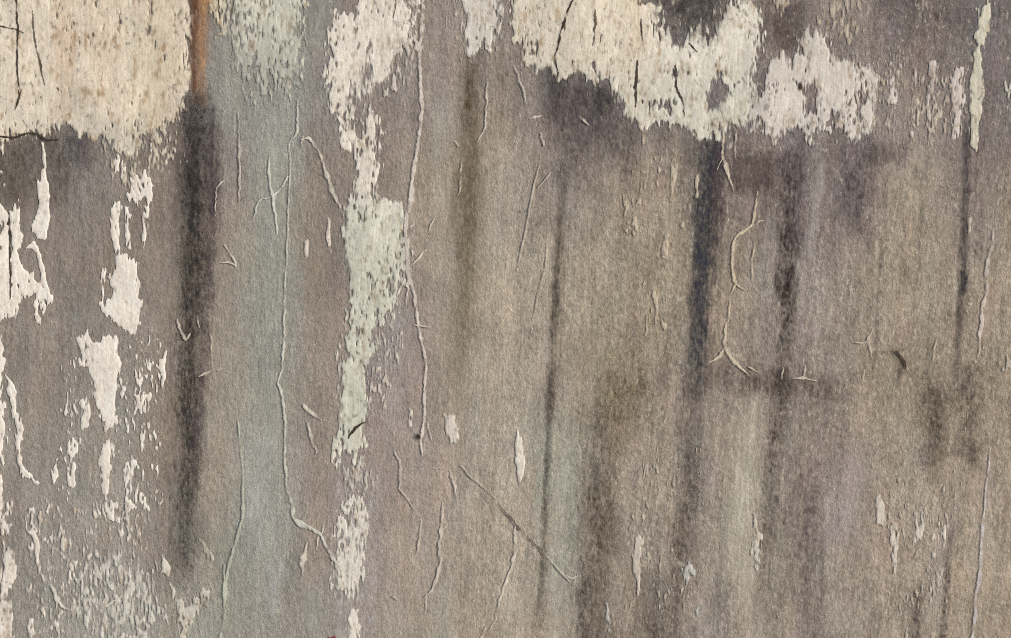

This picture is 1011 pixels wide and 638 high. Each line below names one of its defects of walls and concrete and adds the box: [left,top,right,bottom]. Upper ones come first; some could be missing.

crack [0,0,45,110]
crack [0,132,59,141]
corrosion [191,0,208,87]
peeling [209,0,312,106]
crack [554,0,597,73]
peeling [446,0,991,152]
peeling [0,0,212,638]
leakage [182,96,217,354]
peeling [322,0,423,638]
crack [393,0,578,638]
leakage [551,237,560,338]
peeling [616,447,700,621]